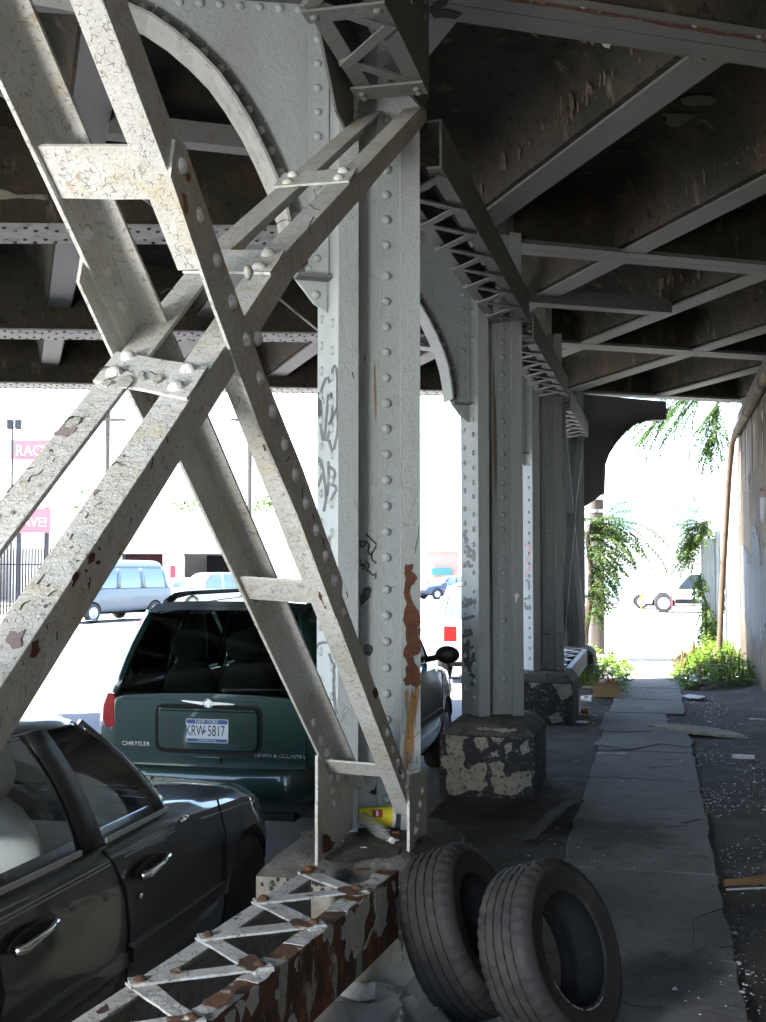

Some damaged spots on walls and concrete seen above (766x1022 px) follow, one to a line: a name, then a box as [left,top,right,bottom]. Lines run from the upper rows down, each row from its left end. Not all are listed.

peeling [540,68,613,131]
corrosion [398,564,421,774]
peeling [552,684,572,700]
peeling [440,727,532,796]
corrosion [289,918,312,929]
peeling [323,881,396,963]
corrosion [236,953,261,972]
corrosion [166,983,237,1022]
peeling [225,985,259,1022]